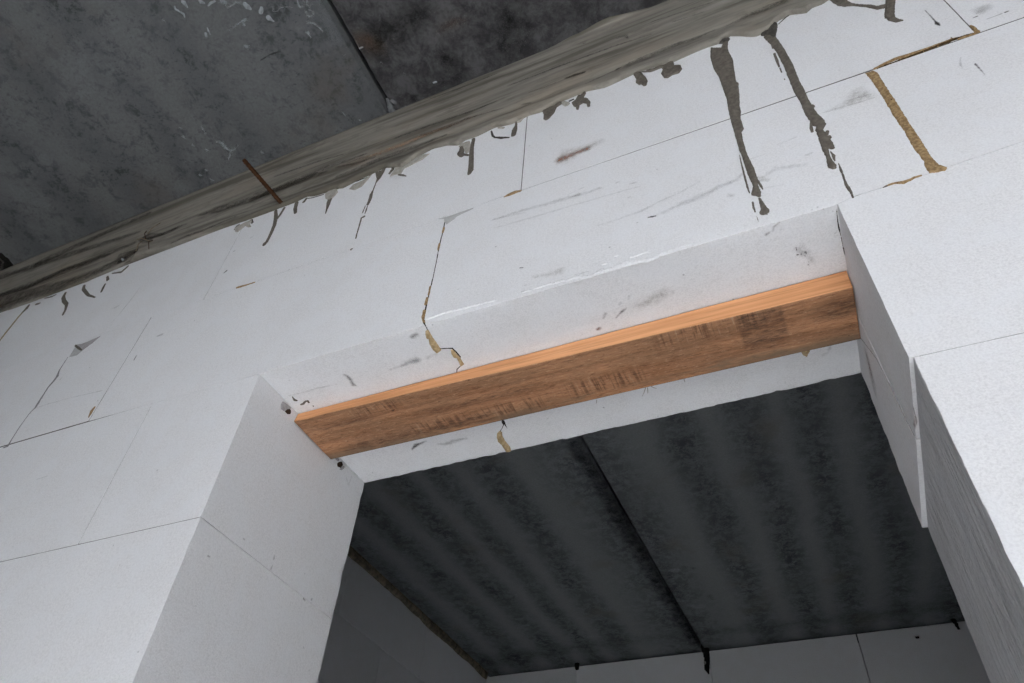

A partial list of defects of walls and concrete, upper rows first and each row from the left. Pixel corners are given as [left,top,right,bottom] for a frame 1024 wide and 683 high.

crack [877,32,975,69]
water stain [0,122,445,311]
water stain [739,155,763,222]
crack [421,222,464,373]
crack [497,420,511,452]